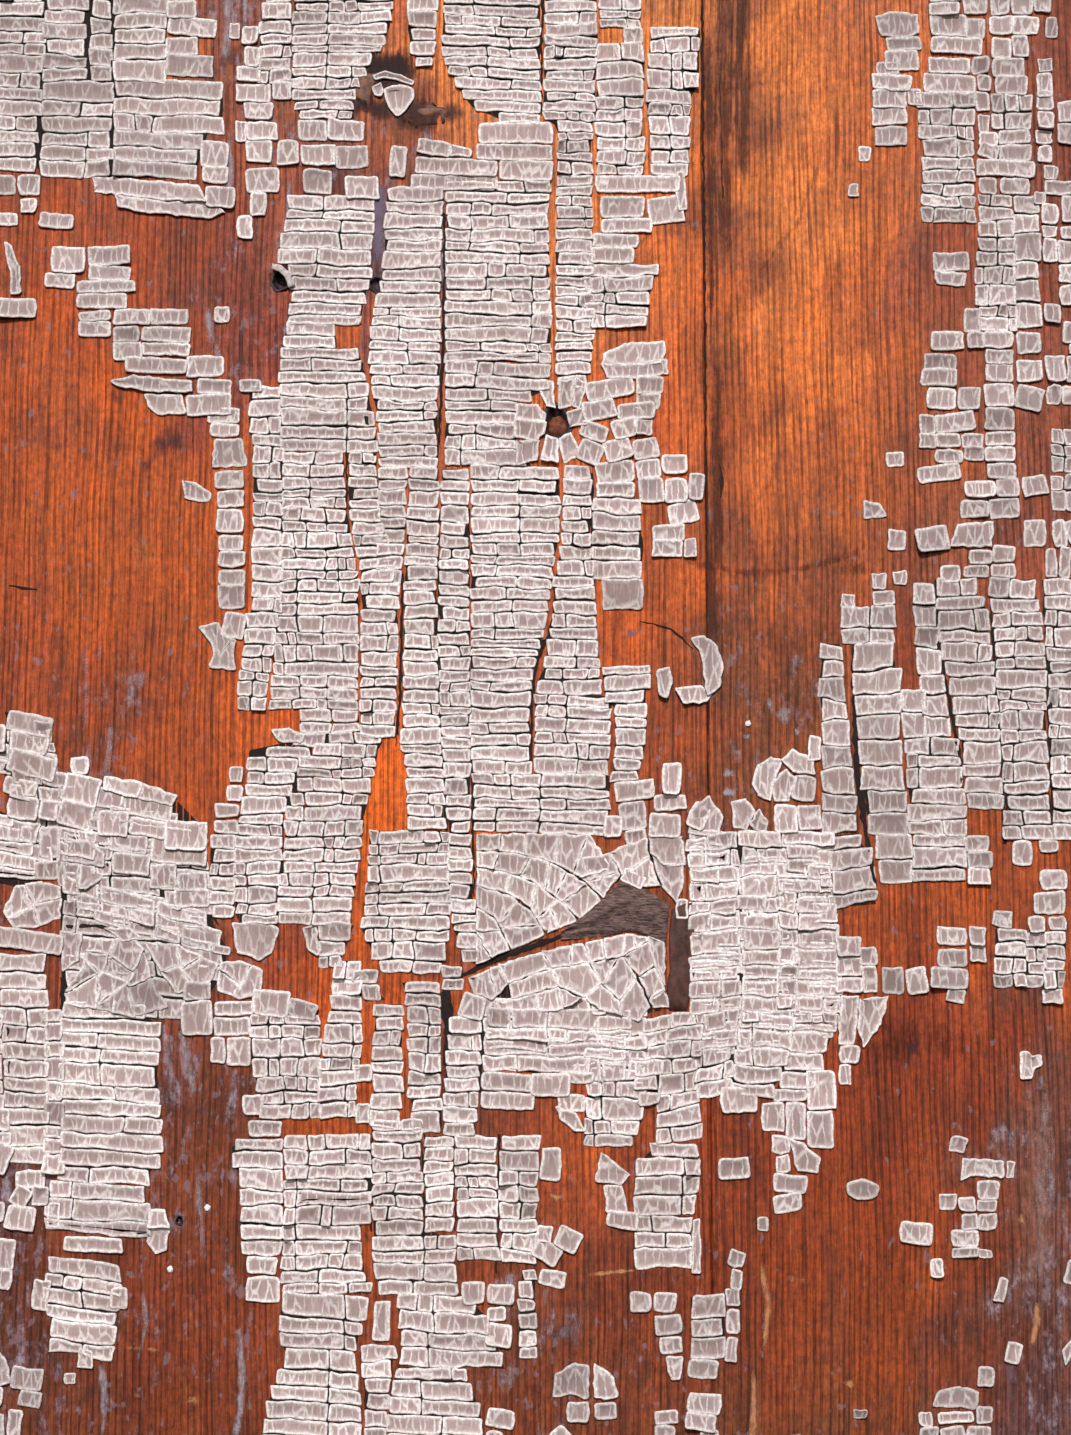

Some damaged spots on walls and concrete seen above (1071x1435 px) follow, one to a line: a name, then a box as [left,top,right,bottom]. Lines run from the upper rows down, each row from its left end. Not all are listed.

peeling [0,0,705,1254]
peeling [232,464,889,1435]
peeling [882,926,987,1004]
peeling [992,869,1068,1005]
peeling [1020,1051,1043,1080]
peeling [899,1136,1016,1278]
peeling [0,1238,16,1291]
peeling [31,1256,128,1385]
peeling [918,1341,1023,1435]
peeling [993,1277,1009,1303]
peeling [1062,1340,1071,1366]
peeling [1063,1260,1071,1285]